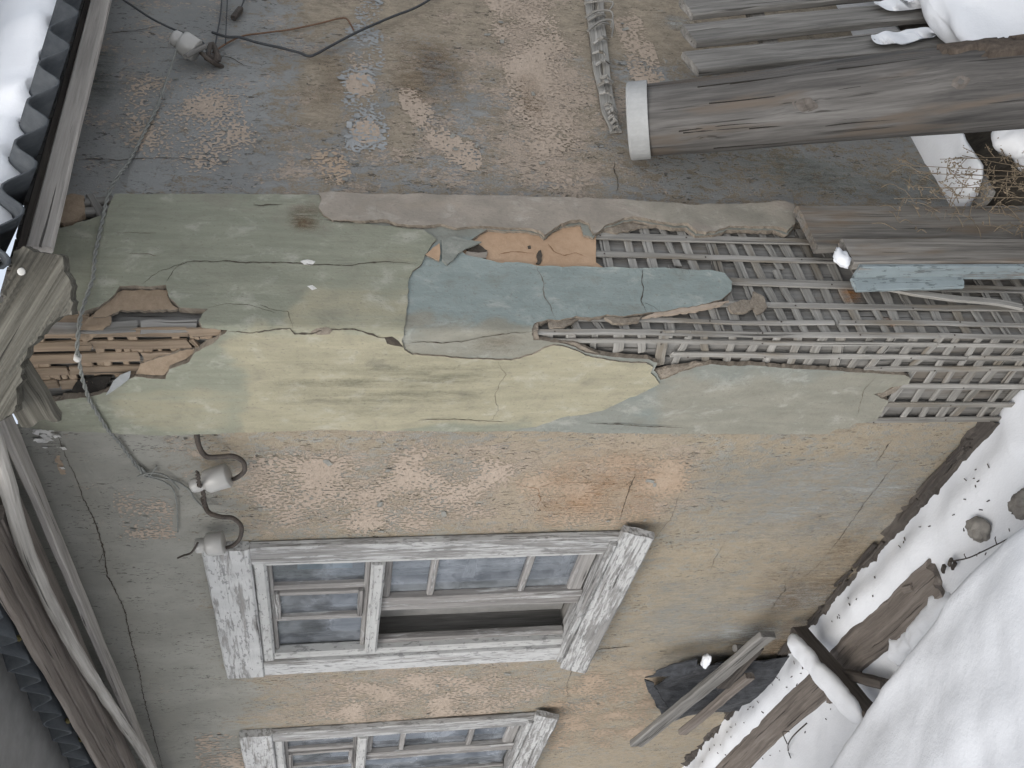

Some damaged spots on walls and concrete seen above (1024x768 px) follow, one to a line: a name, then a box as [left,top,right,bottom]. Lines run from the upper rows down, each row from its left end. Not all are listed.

spalling [425,223,647,267]
spalling [29,290,222,395]
crack [212,303,532,345]
spalling [604,291,767,326]
crack [58,437,163,768]